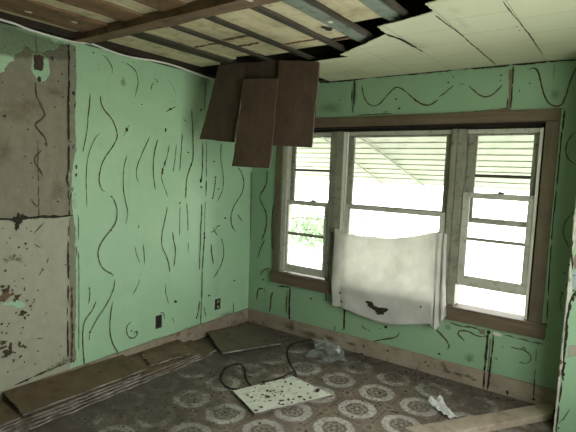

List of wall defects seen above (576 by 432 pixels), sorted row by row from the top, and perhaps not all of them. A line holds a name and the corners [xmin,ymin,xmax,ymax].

crack [320,2,576,115]
peeling [0,44,77,400]
crack [199,141,207,316]
crack [451,323,543,389]
spalling [553,215,576,432]